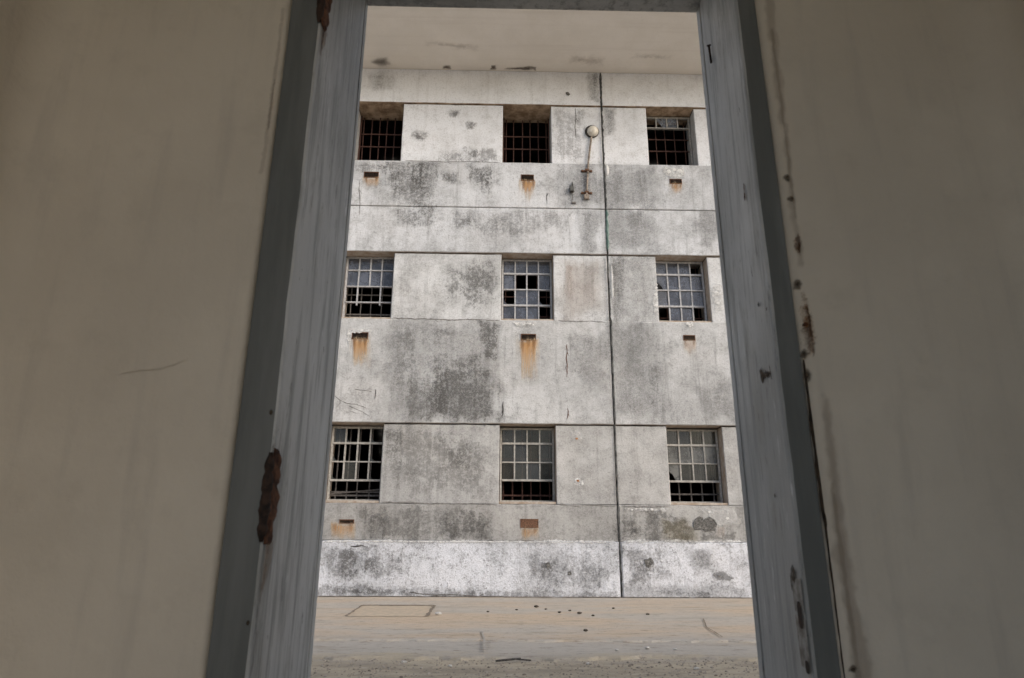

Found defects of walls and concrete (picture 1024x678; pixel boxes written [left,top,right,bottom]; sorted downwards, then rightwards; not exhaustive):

corrosion [802,298,815,354]
corrosion [353,339,369,360]
corrosion [520,339,537,372]